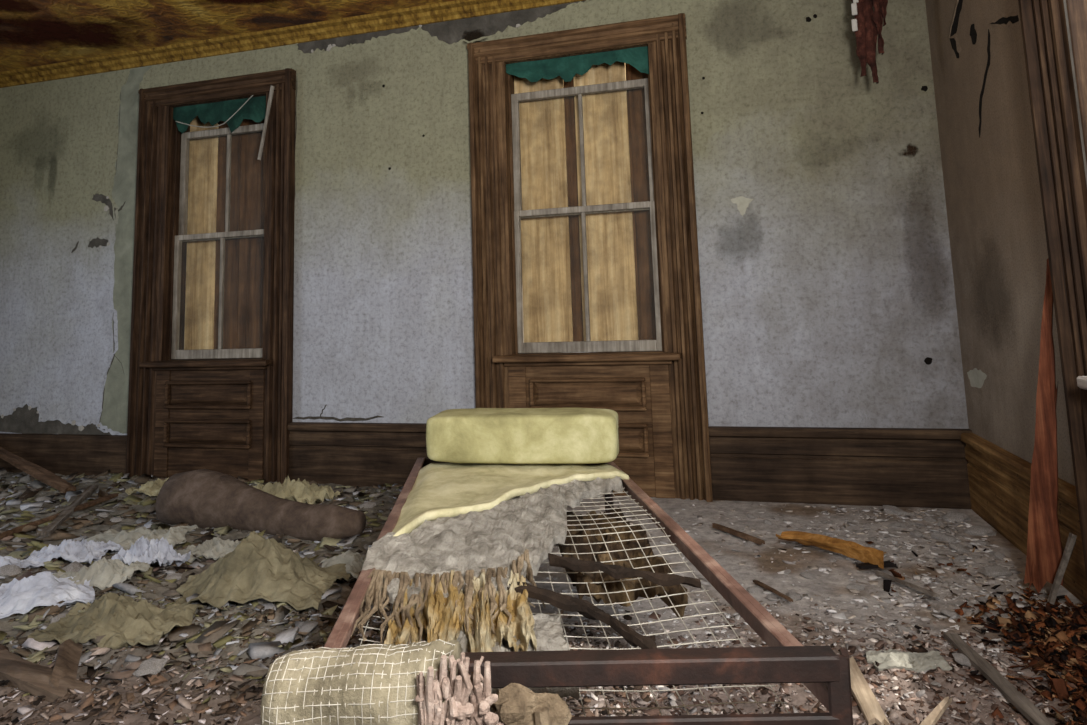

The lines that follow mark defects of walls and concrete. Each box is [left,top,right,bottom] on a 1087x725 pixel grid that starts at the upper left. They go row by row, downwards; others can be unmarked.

spalling [294,0,597,57]
spalling [0,65,155,435]